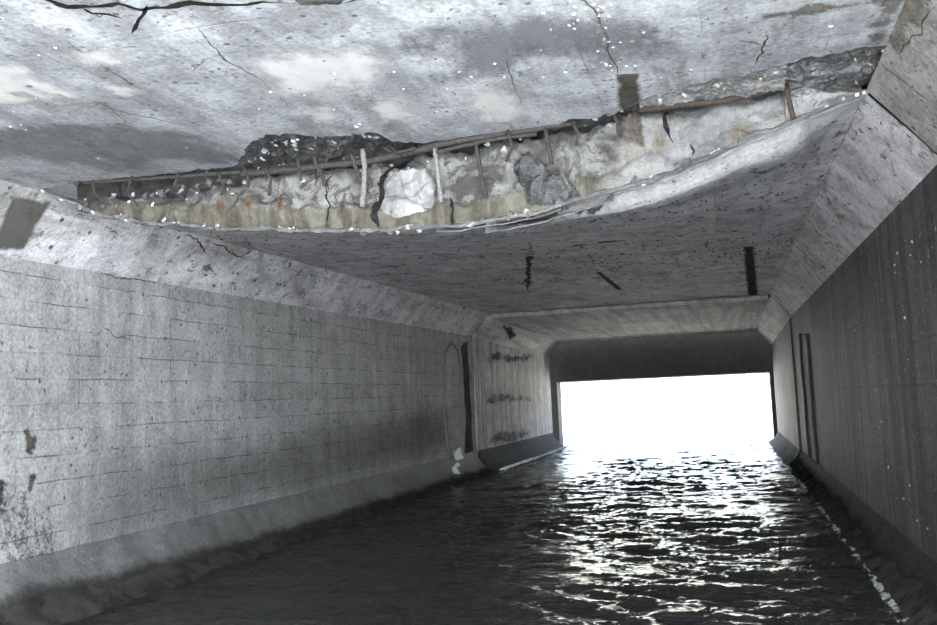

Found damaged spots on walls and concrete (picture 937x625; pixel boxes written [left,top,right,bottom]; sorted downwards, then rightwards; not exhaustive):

crack [61,88,196,128]
crack [45,0,296,111]
spalling [80,132,451,218]
spalling [484,140,510,160]
peeling [436,192,614,233]
crack [584,0,618,75]
spalling [572,45,886,136]
crack [876,8,934,100]
water stain [0,342,495,625]